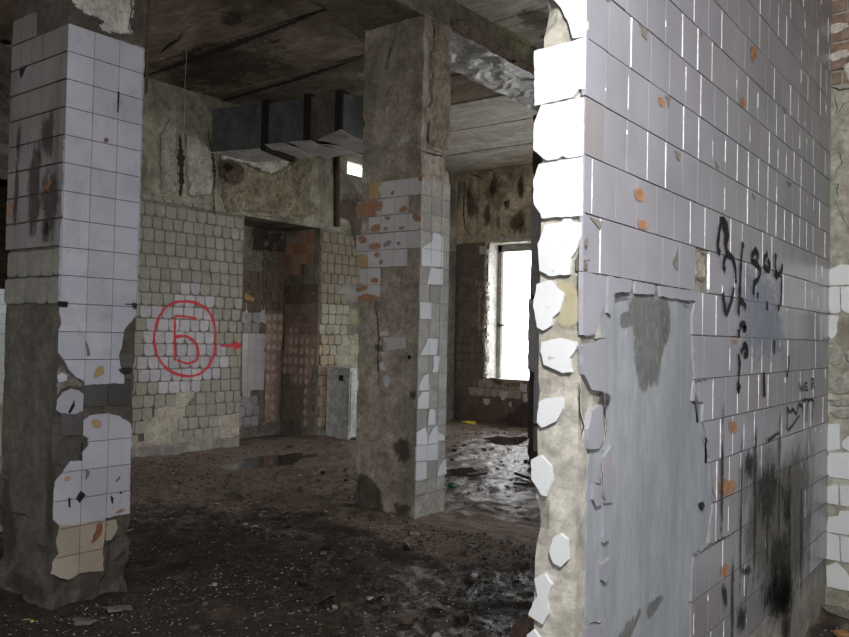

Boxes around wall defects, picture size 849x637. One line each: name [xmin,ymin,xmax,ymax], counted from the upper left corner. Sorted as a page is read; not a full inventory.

crack [831,87,849,131]
leakage [0,111,60,243]
crack [833,152,848,227]
spalling [575,238,590,273]
peeling [56,365,82,394]
crack [373,301,381,386]
leakage [722,424,803,637]